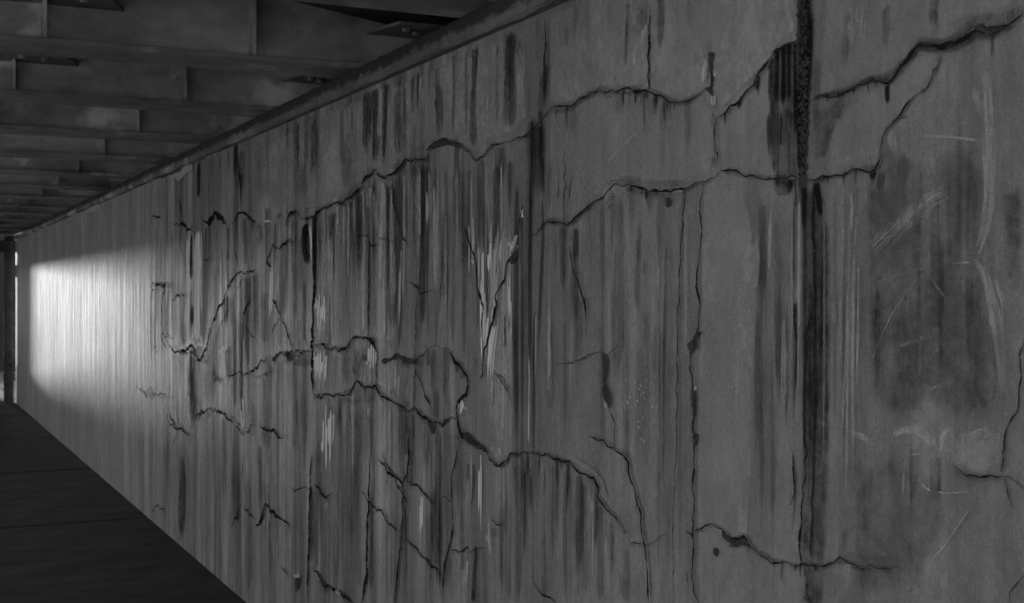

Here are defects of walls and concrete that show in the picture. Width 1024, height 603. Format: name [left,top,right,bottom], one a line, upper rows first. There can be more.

damp [826,81,889,118]
crack [135,368,190,462]
damp [150,231,256,428]
damp [252,35,550,468]
damp [383,366,442,547]
crack [150,18,704,603]
damp [465,457,491,599]
damp [543,0,829,601]
crack [530,13,1024,603]